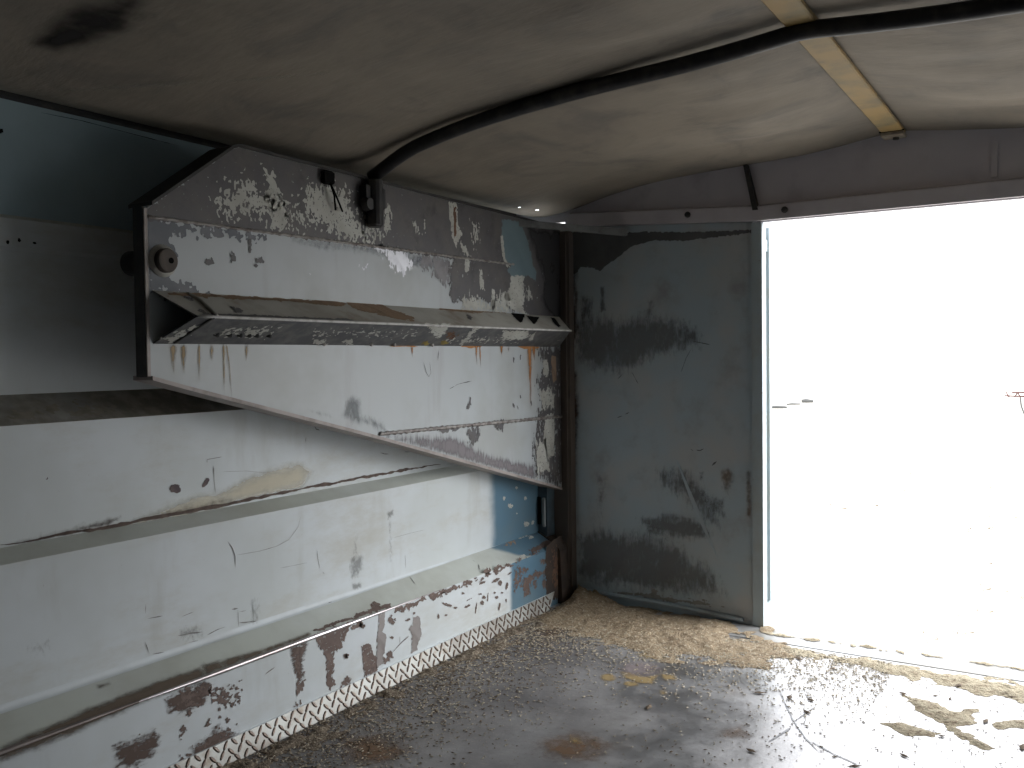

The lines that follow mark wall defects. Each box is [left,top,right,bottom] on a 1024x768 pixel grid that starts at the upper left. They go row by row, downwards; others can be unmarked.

peeling [148,148,560,316]
corrosion [518,346,539,397]
peeling [0,323,562,761]
corrosion [545,535,563,600]
peeling [113,731,160,768]